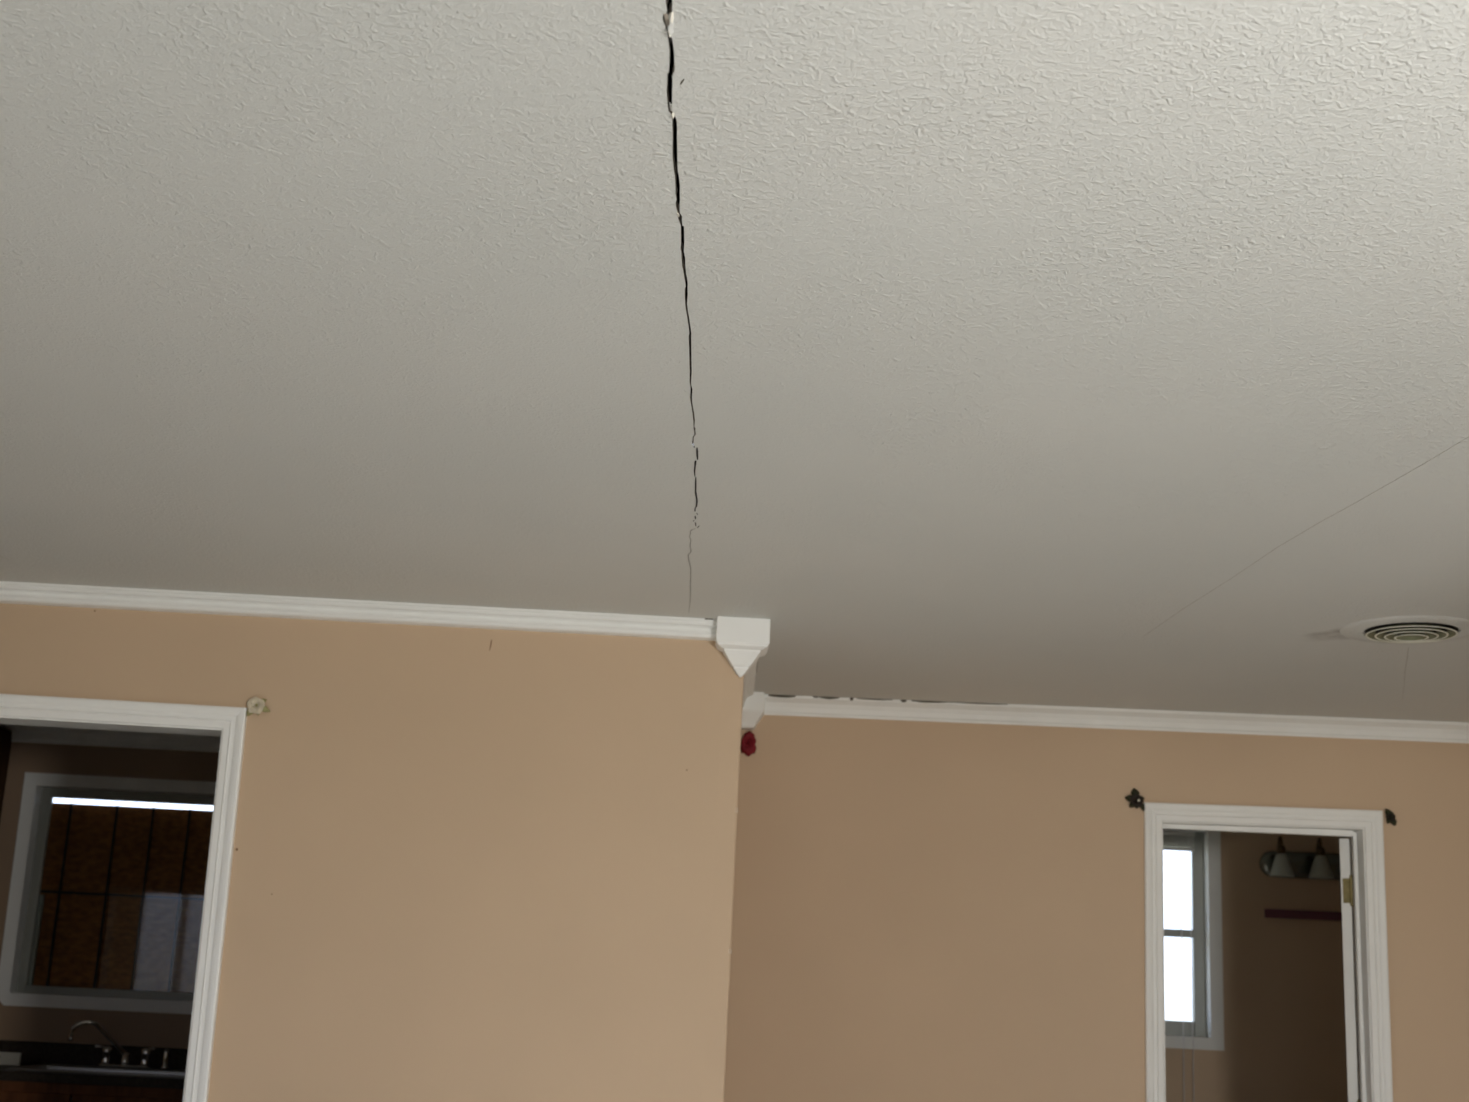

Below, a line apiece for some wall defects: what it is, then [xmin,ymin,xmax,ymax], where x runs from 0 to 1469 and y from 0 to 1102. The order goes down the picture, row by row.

crack [663,0,713,620]